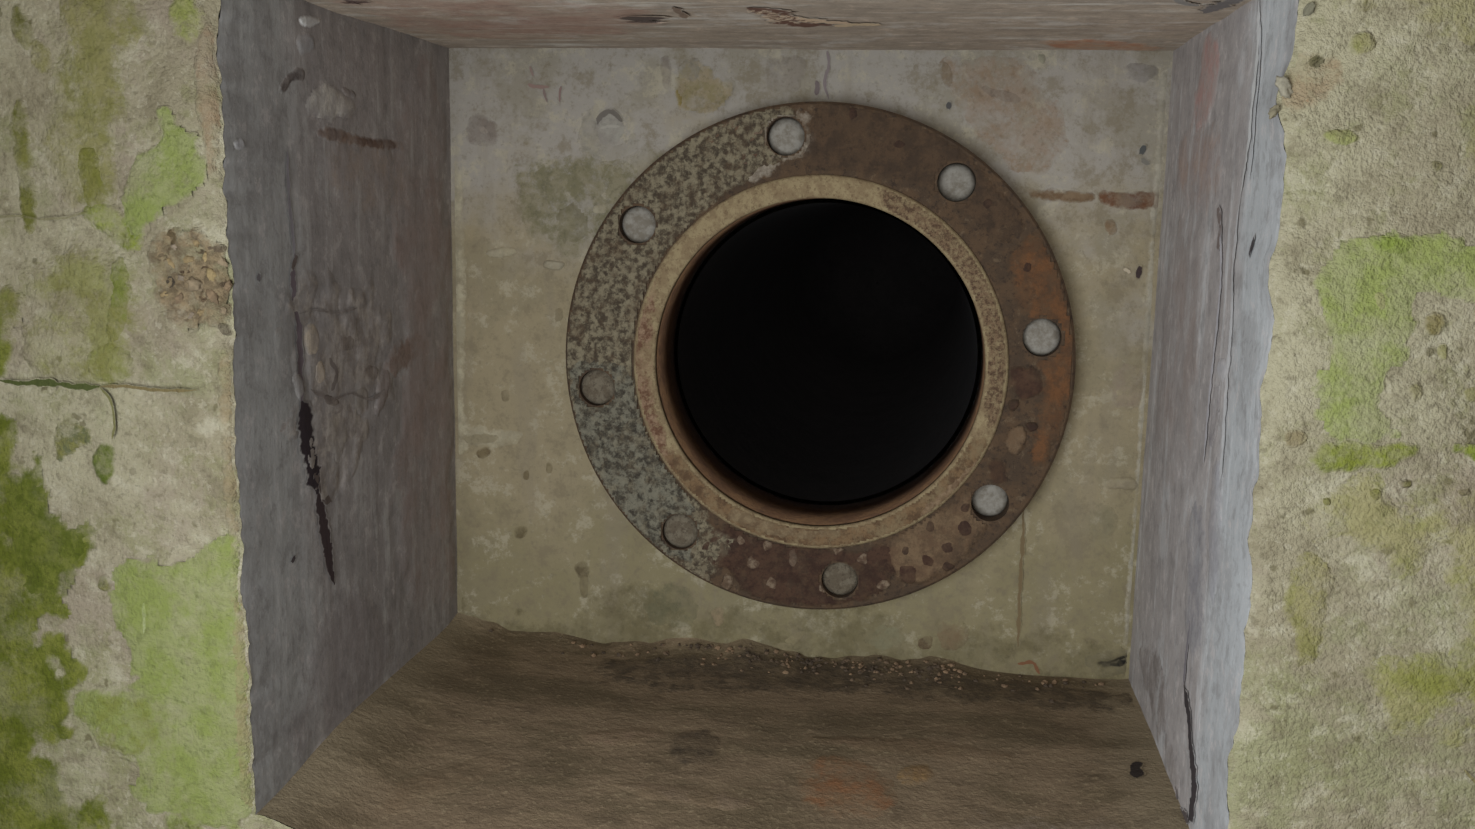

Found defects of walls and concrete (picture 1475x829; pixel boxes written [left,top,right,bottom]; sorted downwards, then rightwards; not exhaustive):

peeling [168,0,207,46]
peeling [82,106,233,336]
rust [1025,188,1154,236]
crack [286,151,335,585]
rust [636,277,675,467]
rust [876,187,1073,467]
damp [1425,311,1448,360]
rust [702,490,975,607]
crack [1174,620,1198,824]